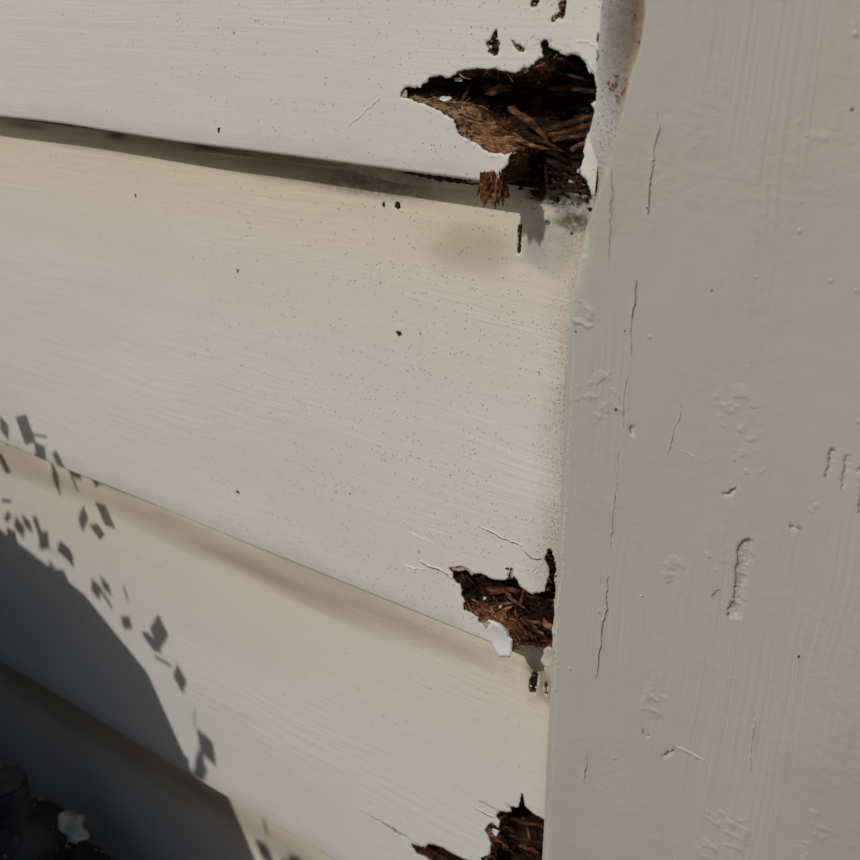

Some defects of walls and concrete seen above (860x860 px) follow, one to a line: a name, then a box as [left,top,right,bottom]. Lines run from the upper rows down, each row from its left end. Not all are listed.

peeling [486,29,525,56]
peeling [482,621,513,658]
peeling [524,648,552,694]